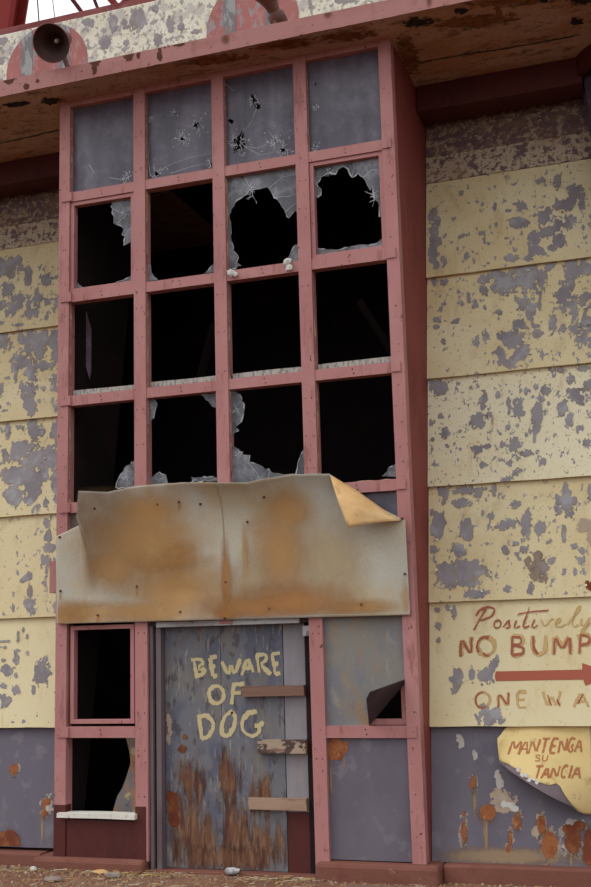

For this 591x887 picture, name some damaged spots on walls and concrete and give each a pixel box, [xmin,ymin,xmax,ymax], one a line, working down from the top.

peeling [90,4,159,75]
peeling [460,174,591,370]
peeling [0,255,59,615]
peeling [465,383,551,469]
peeling [553,365,591,429]
corrosion [57,495,211,623]
corrosion [219,551,383,618]
peeling [430,482,591,600]
corrosion [0,830,21,847]
corrosion [166,734,286,871]
corrosion [328,738,348,795]
corrosion [450,805,591,867]